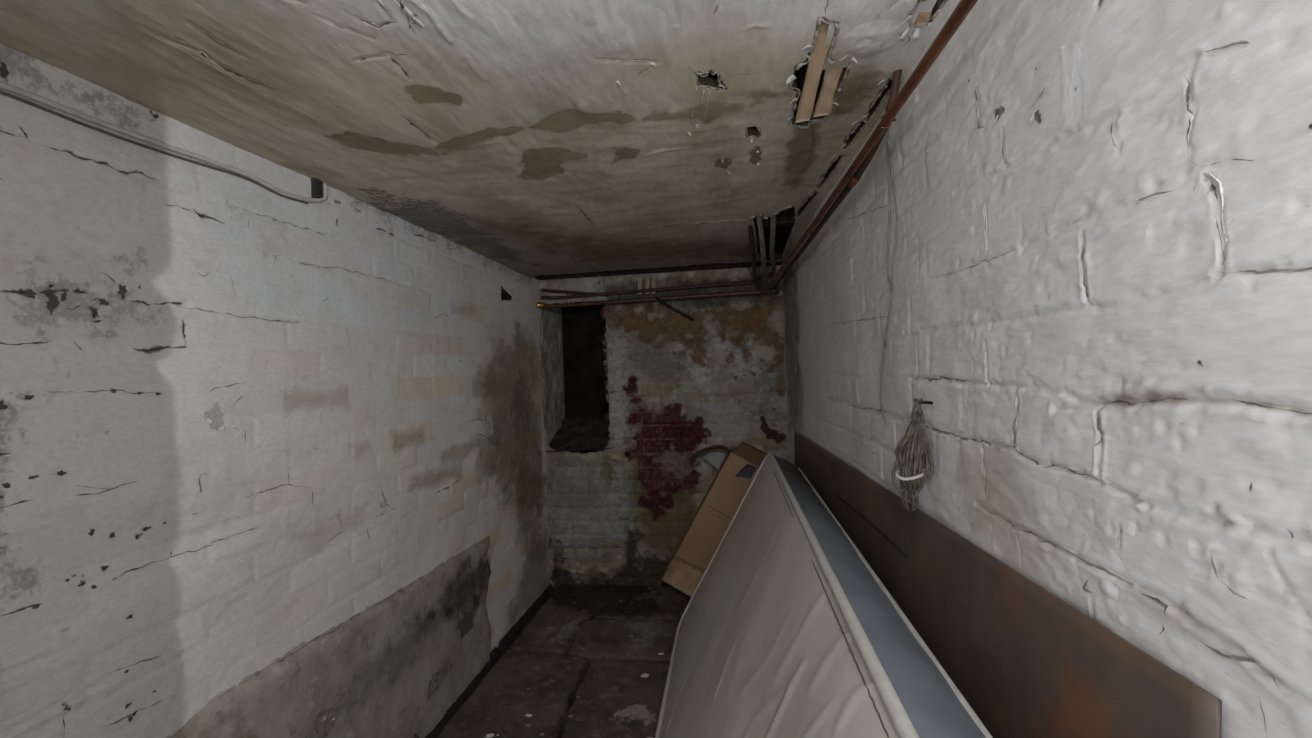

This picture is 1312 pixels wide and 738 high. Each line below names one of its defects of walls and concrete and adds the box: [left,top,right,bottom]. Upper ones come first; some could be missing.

flaking render [899,15,921,41]
damp [405,85,462,105]
damp [329,110,635,180]
damp [613,148,640,163]
crack [1135,41,1312,278]
crack [0,125,394,302]
crack [0,340,81,350]
damp [372,561,491,682]